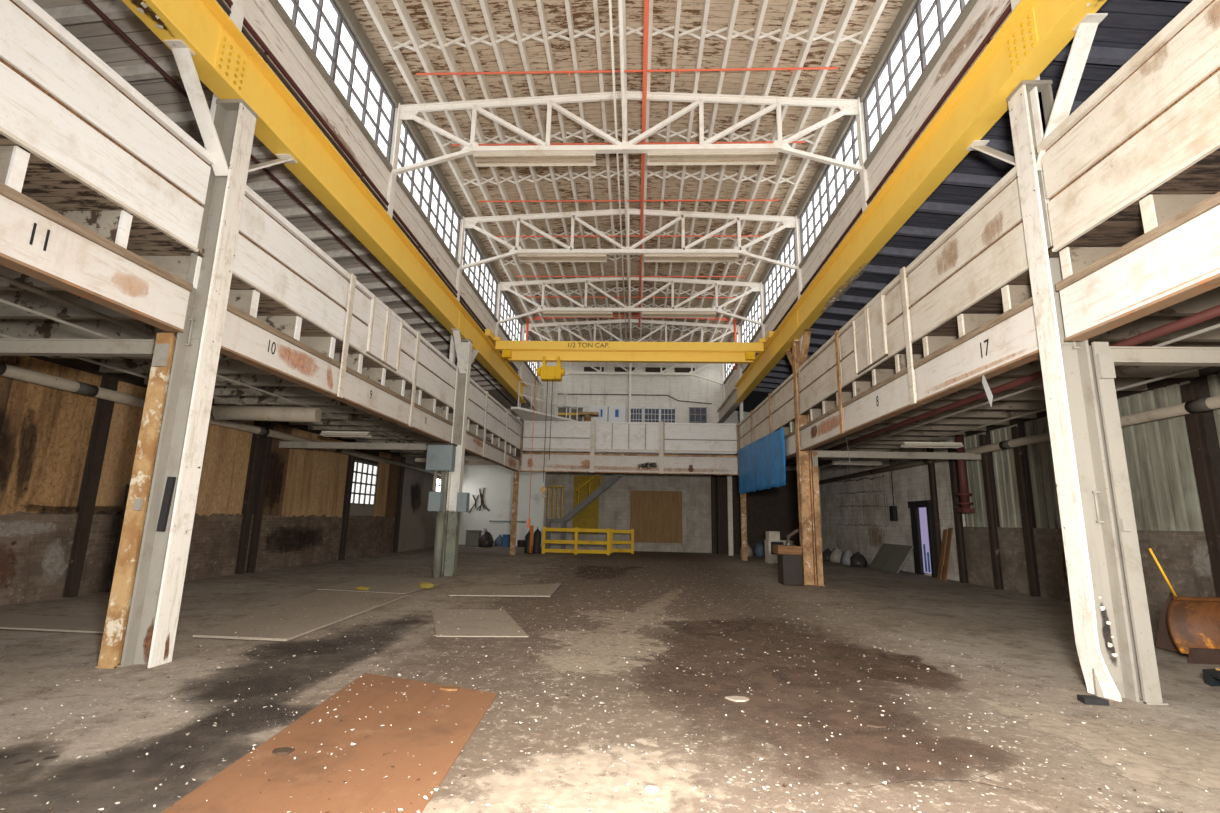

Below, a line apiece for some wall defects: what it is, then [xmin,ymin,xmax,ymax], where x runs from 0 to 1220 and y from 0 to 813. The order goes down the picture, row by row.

corrosion [282,349,310,372]
leakage [0,413,36,487]